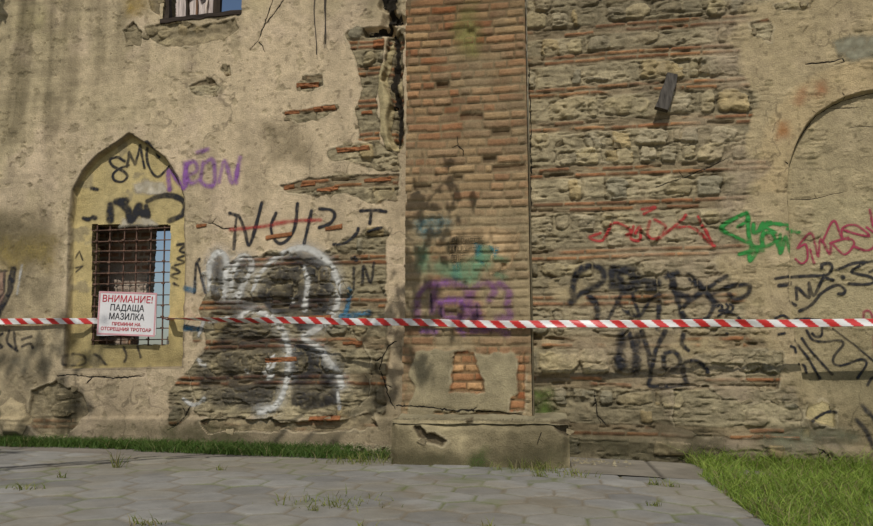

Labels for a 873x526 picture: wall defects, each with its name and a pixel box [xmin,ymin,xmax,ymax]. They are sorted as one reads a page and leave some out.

spalling [124,0,238,46]
spalling [190,77,219,96]
crack [369,0,404,150]
spalling [282,27,406,203]
spalling [265,232,292,240]
spalling [188,250,377,435]
crack [377,341,521,415]
spalling [450,351,484,393]
spalling [30,380,88,436]
spalling [415,426,445,445]